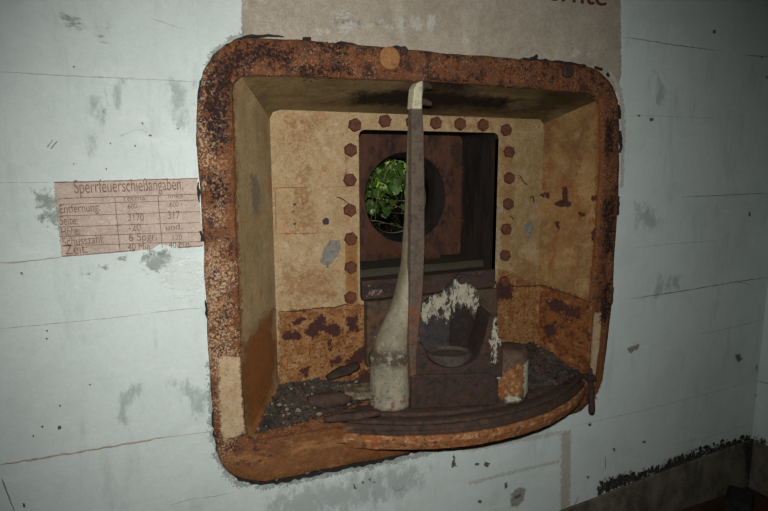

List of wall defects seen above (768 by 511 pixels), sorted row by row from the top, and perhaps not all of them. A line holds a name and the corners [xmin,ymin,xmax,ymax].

rust [198,41,370,434]
rust [495,115,616,402]
damp [596,435,767,496]